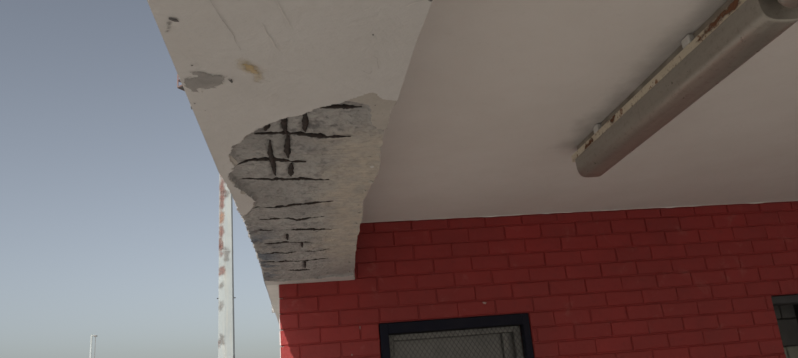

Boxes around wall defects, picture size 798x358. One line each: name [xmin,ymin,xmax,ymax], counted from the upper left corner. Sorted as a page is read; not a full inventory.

peeling [184,65,233,92]
spalling [228,93,397,282]